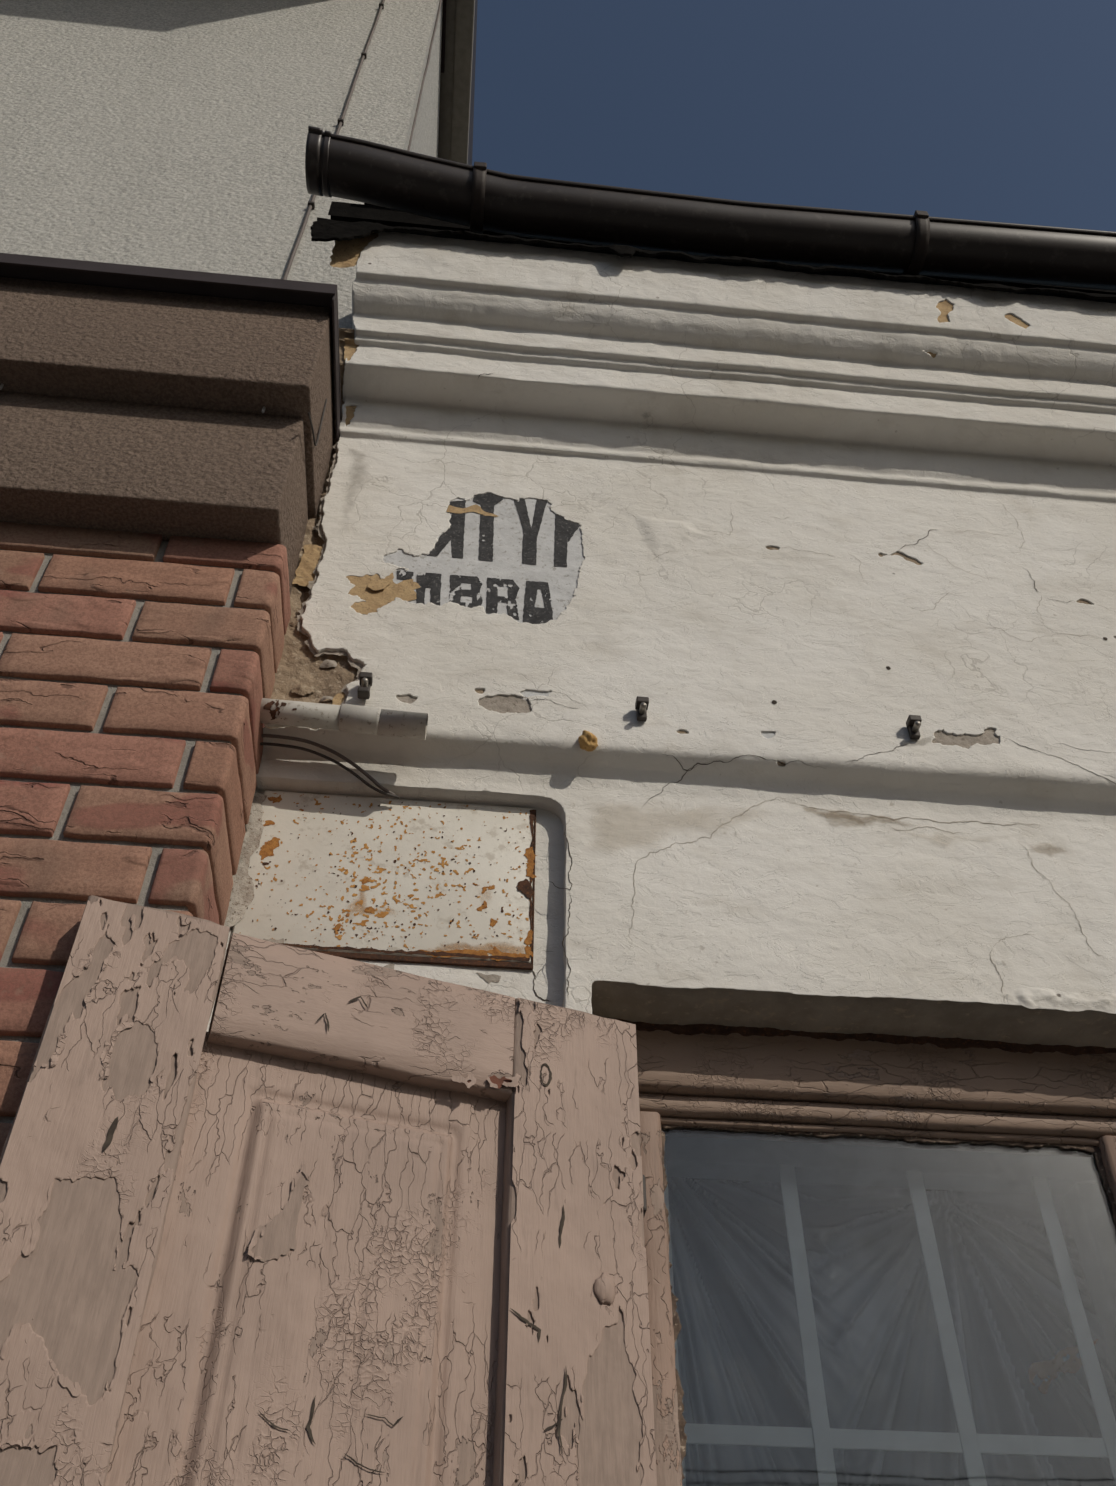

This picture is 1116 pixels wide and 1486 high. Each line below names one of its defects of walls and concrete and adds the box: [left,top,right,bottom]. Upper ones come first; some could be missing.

spalling [330,233,378,268]
peeling [936,300,954,323]
spalling [271,328,364,705]
peeling [346,493,585,624]
peeling [475,690,571,713]
peeling [932,729,1116,784]
peeling [146,792,267,994]
corrosion [240,793,537,961]
crack [622,745,1101,956]
peeling [29,918,120,1082]
peeling [451,1073,519,1089]
peeling [0,1434,61,1486]